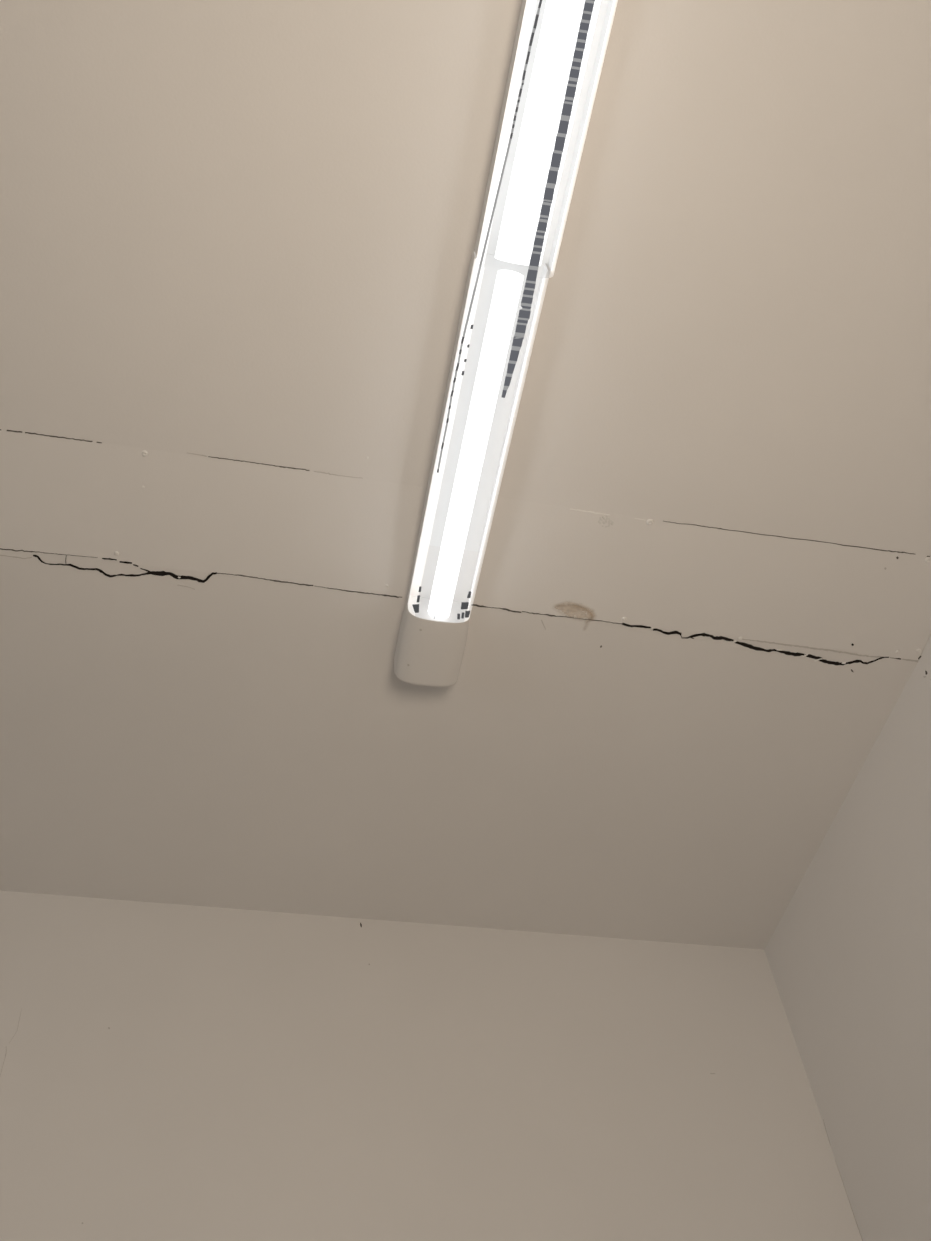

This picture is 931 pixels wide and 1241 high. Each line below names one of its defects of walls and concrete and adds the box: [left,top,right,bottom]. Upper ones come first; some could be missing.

crack [0,548,402,598]
crack [471,604,921,665]